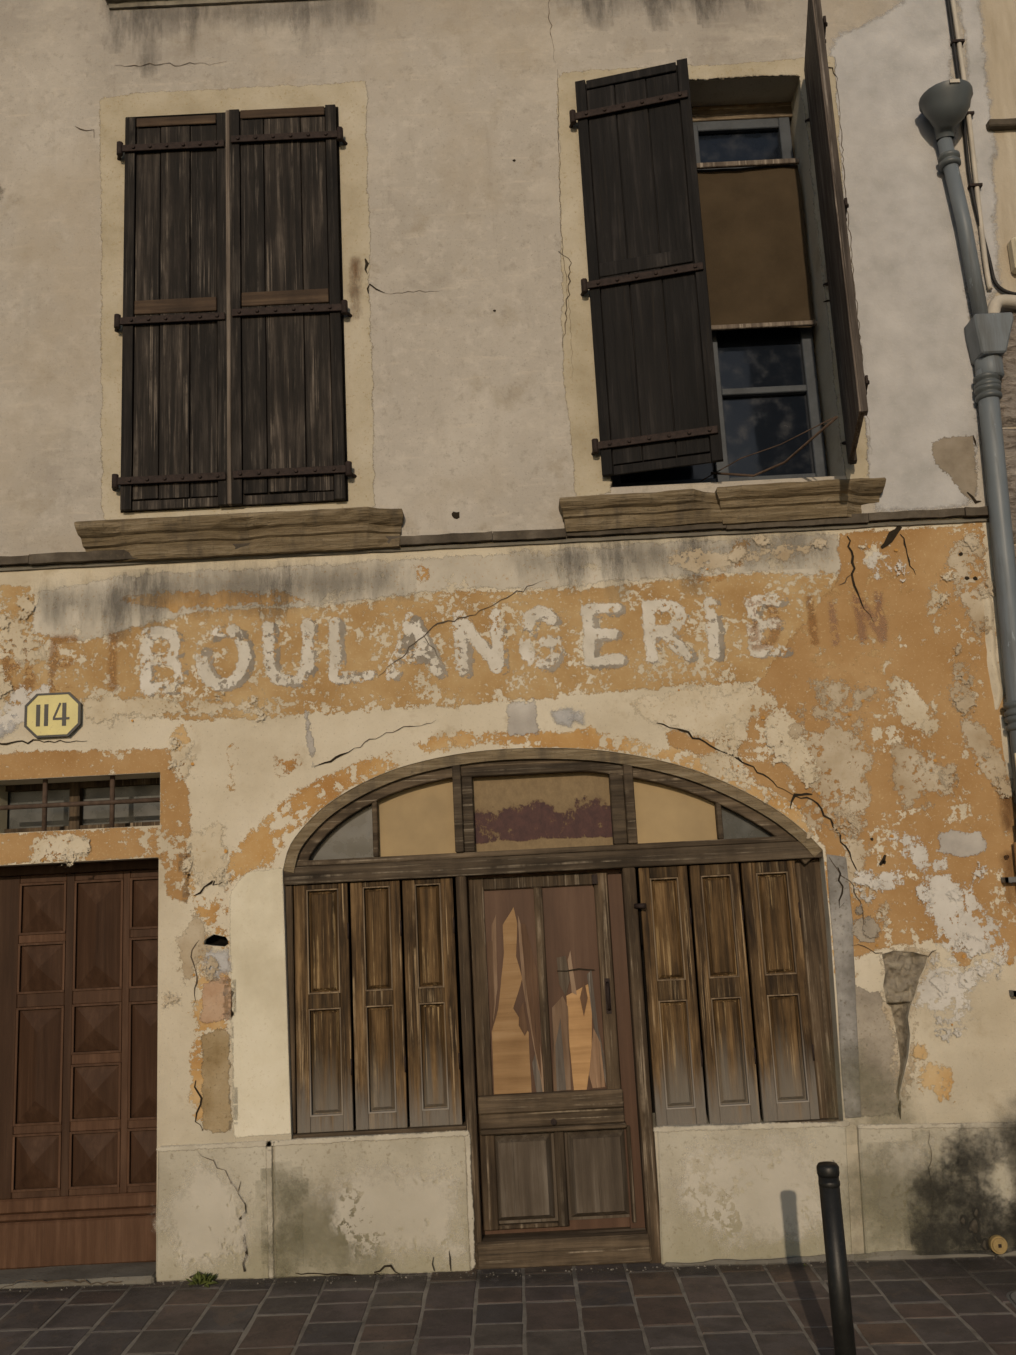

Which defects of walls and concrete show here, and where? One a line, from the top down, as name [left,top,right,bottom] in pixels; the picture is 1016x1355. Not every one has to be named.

flaking render [932,435,981,504]
peeling [0,596,55,716]
crack [380,579,548,675]
crack [840,536,873,621]
peeling [858,526,910,582]
peeling [925,532,996,645]
crack [0,738,83,746]
peeling [27,831,91,867]
crack [657,723,866,937]
peeling [629,643,1015,1119]
flaking render [161,822,234,1134]
water stain [878,1123,1016,1256]